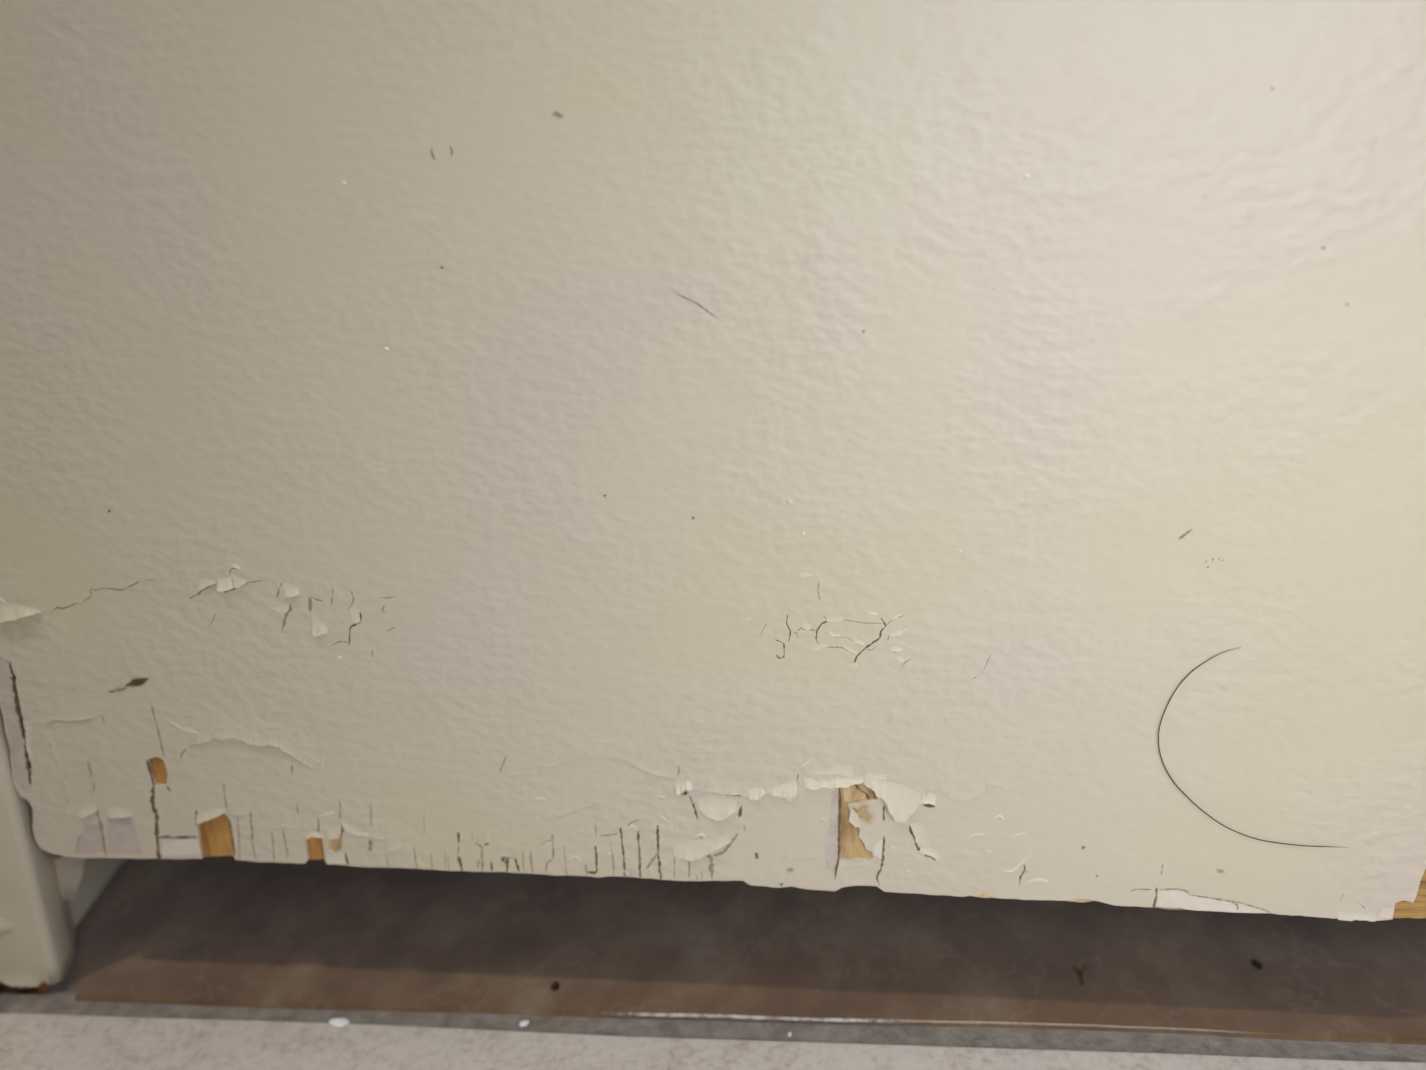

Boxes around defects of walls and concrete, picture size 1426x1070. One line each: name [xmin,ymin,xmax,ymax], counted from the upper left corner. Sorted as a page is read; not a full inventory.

peeling [0,563,262,623]
peeling [271,582,362,646]
crack [745,572,912,671]
crack [150,705,185,859]
peeling [55,857,85,899]
peeling [106,806,142,855]
peeling [159,807,235,857]
crack [223,783,298,861]
peeling [304,817,370,865]
crack [387,813,677,880]
peeling [632,750,961,886]
peeling [1338,860,1426,922]